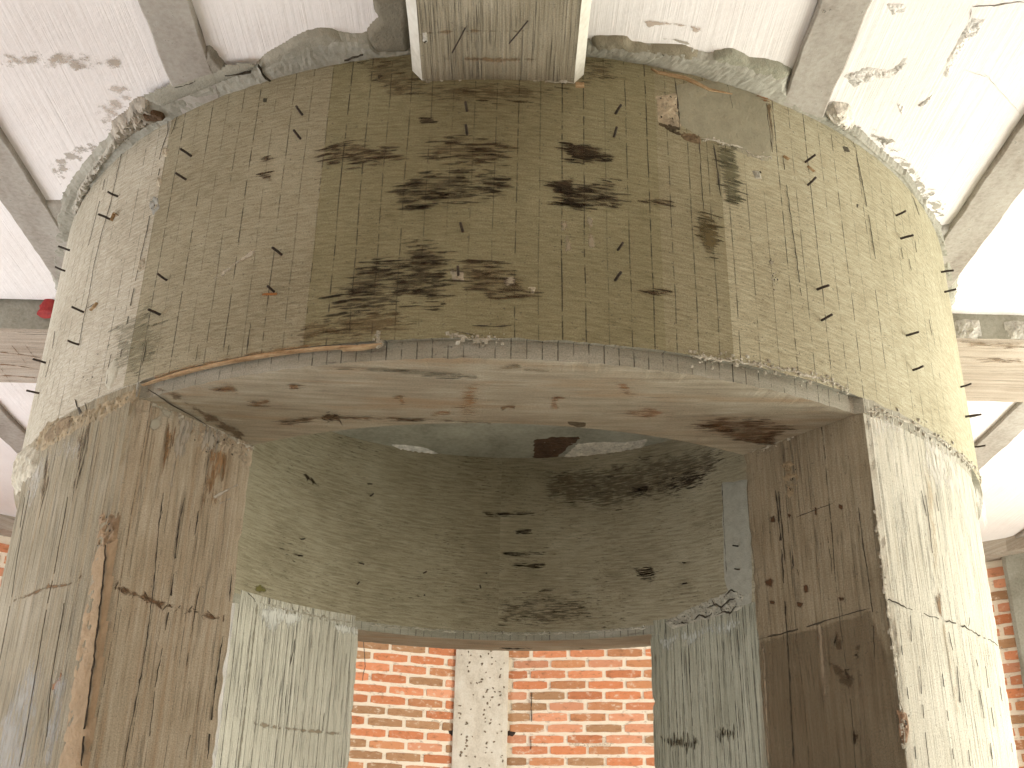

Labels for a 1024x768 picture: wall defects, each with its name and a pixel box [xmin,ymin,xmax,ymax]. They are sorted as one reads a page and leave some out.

spalling [887,3,907,15]
spalling [844,58,907,87]
spalling [943,18,986,78]
spalling [655,93,724,146]
water stain [388,135,517,210]
water stain [555,142,613,163]
water stain [544,179,675,211]
water stain [713,144,748,204]
water stain [318,239,544,333]
spalling [36,393,129,446]
crack [676,490,736,625]
crack [758,490,1013,766]